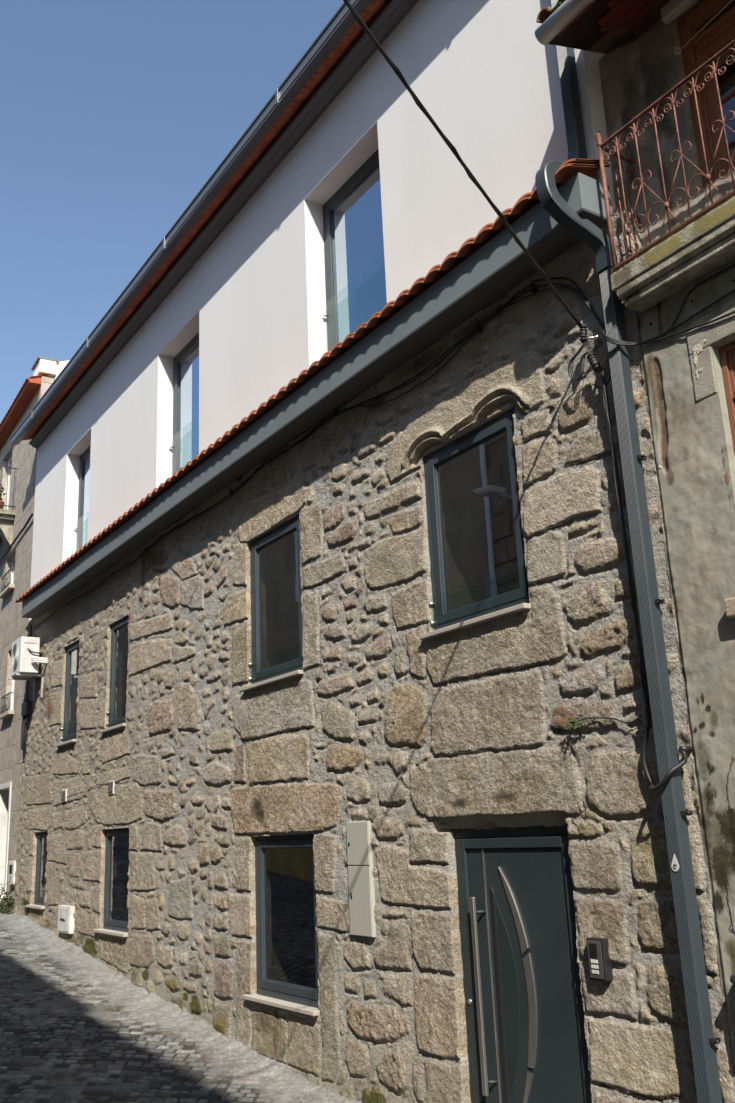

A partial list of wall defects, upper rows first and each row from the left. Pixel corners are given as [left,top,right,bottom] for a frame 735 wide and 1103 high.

water stain [679,651,735,913]
crack [715,757,735,934]